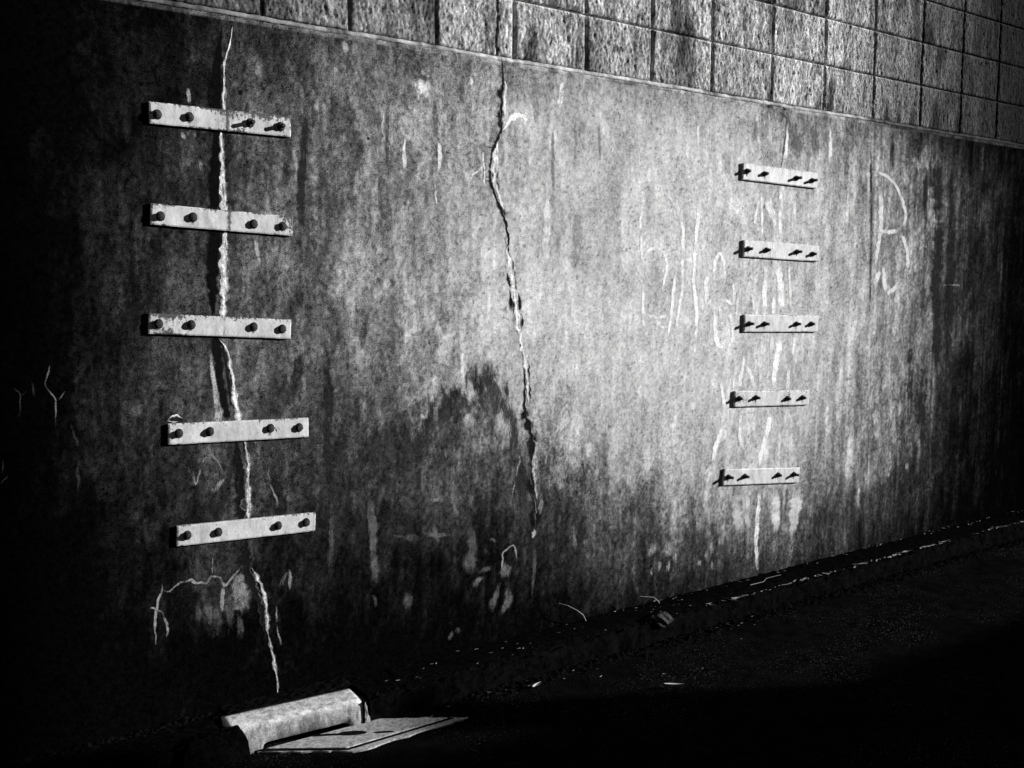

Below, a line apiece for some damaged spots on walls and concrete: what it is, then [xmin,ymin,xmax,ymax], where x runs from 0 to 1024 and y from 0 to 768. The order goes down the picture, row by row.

crack [151,25,292,692]
water stain [291,357,304,389]
water stain [322,348,558,555]
crack [469,39,541,588]